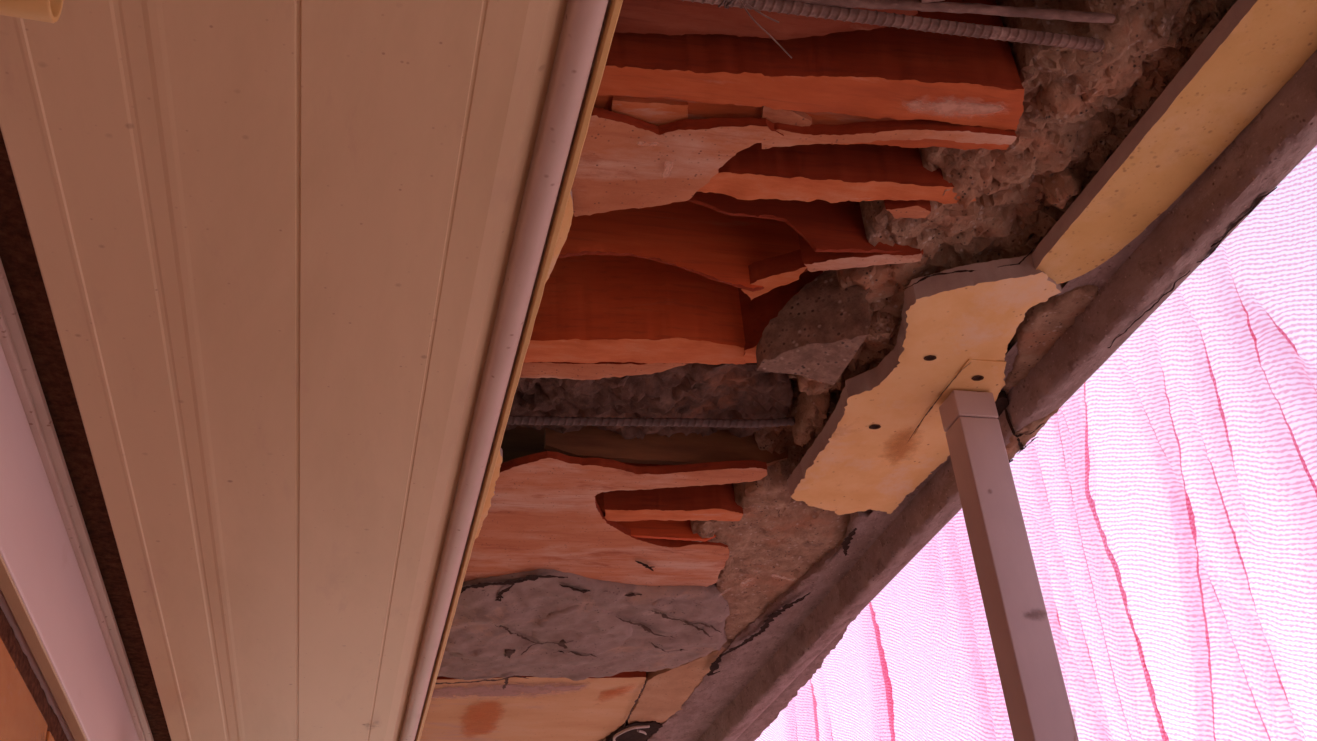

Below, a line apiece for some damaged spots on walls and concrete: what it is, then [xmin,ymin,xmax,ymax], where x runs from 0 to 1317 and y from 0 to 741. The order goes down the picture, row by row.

spalling [507,0,1237,741]
crack [841,528,857,556]
crack [435,561,810,689]
crack [609,679,647,741]